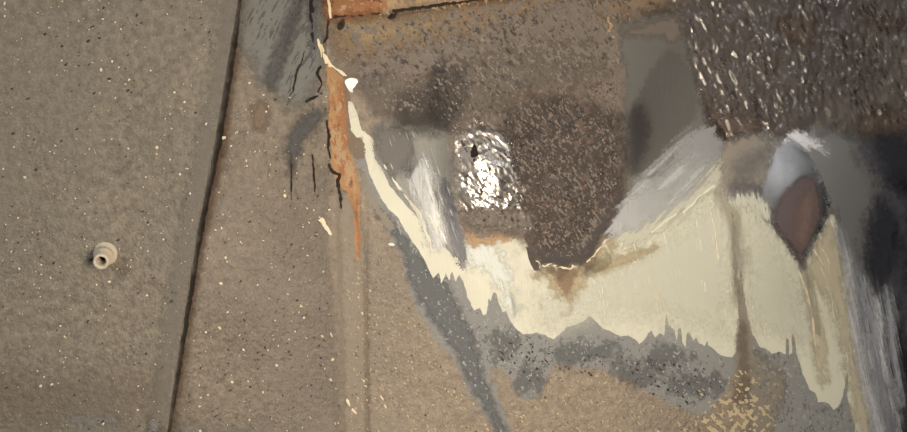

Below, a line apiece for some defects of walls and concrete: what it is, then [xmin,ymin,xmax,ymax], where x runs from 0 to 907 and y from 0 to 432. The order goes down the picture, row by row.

water stain [265,0,324,89]
water stain [286,110,322,173]
rust [322,0,675,432]
rust [733,271,755,402]